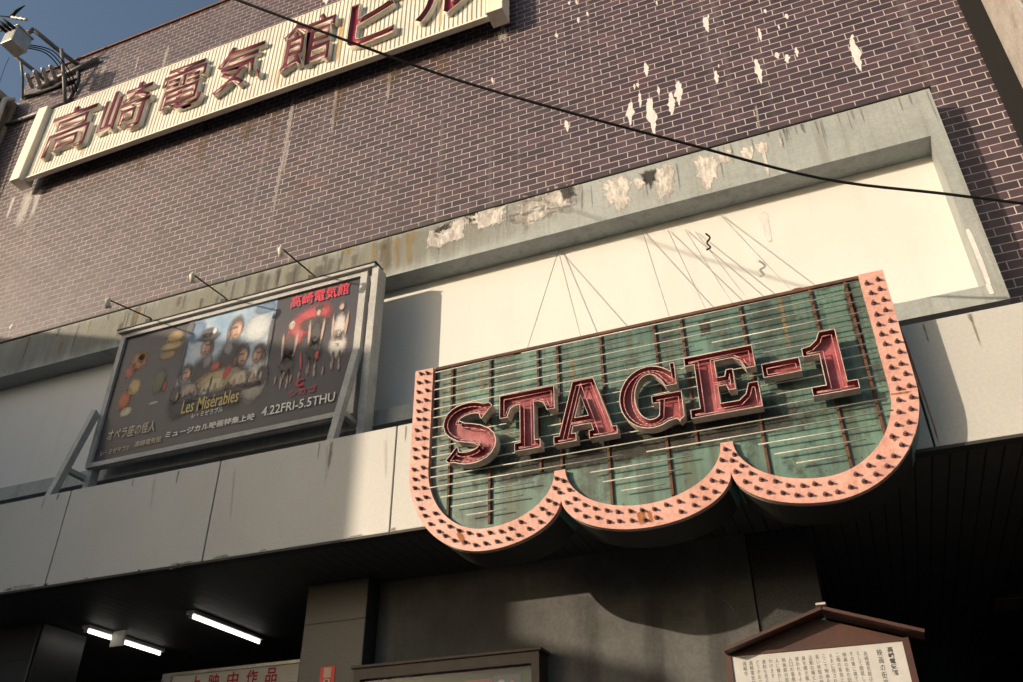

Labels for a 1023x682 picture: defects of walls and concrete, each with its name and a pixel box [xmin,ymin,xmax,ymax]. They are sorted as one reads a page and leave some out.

peeling [849,34,862,72]
peeling [626,63,683,134]
peeling [599,163,675,212]
peeling [691,142,770,192]
peeling [425,183,581,249]